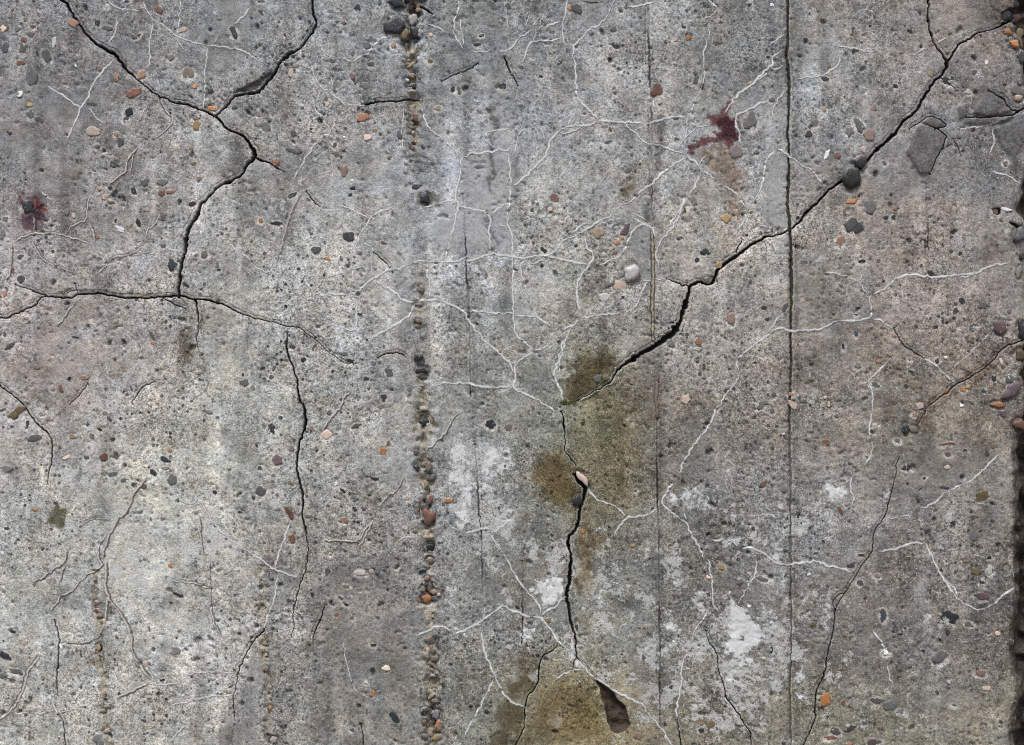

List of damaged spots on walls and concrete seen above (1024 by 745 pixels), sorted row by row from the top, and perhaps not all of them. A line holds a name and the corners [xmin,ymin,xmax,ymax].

crack [725,35,872,143]
crack [855,0,1024,174]
crack [0,0,355,745]
crack [293,0,843,745]
crack [680,262,1024,472]
water stain [516,622,536,652]
water stain [529,572,564,608]
spalling [596,681,630,734]
crack [711,455,1014,745]